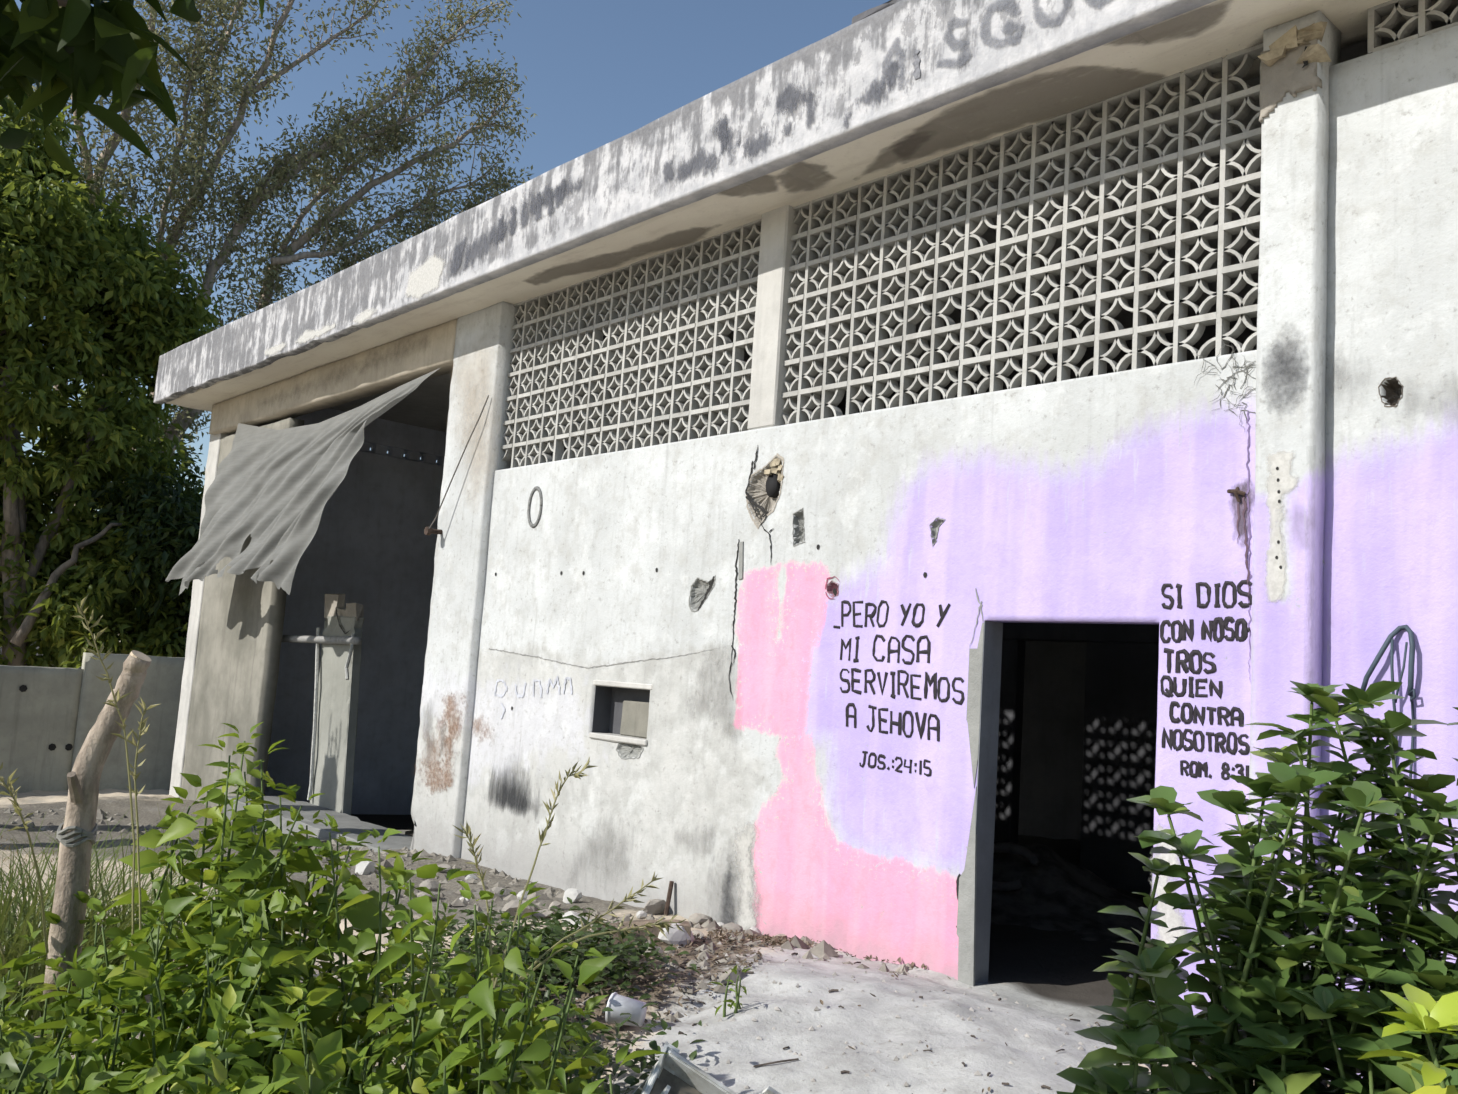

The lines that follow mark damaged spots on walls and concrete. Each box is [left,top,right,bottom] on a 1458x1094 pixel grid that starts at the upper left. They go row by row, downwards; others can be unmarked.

water stain [663,83,815,182]
water stain [868,67,1162,173]
spalling [1257,21,1332,123]
water stain [451,179,582,276]
water stain [528,228,705,285]
spalling [1378,377,1403,407]
crack [489,445,772,697]
spalling [689,575,716,612]
spalling [746,453,784,529]
spalling [792,508,805,547]
crack [1194,338,1257,682]
rust [1227,483,1252,595]